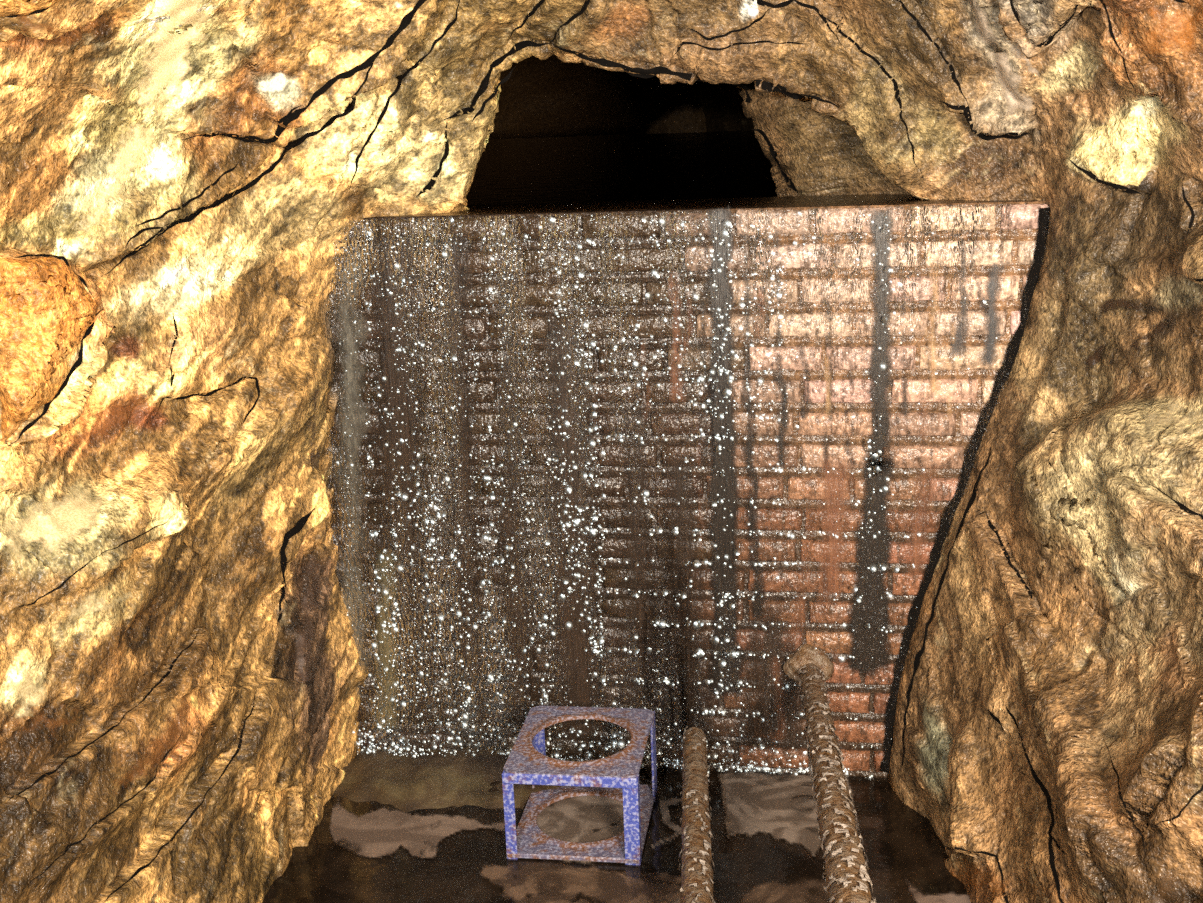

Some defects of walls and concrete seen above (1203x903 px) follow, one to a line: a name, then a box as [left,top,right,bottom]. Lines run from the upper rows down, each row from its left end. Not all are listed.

damp [621,210,877,903]
damp [847,211,907,674]
damp [952,242,967,354]
damp [984,265,1000,365]